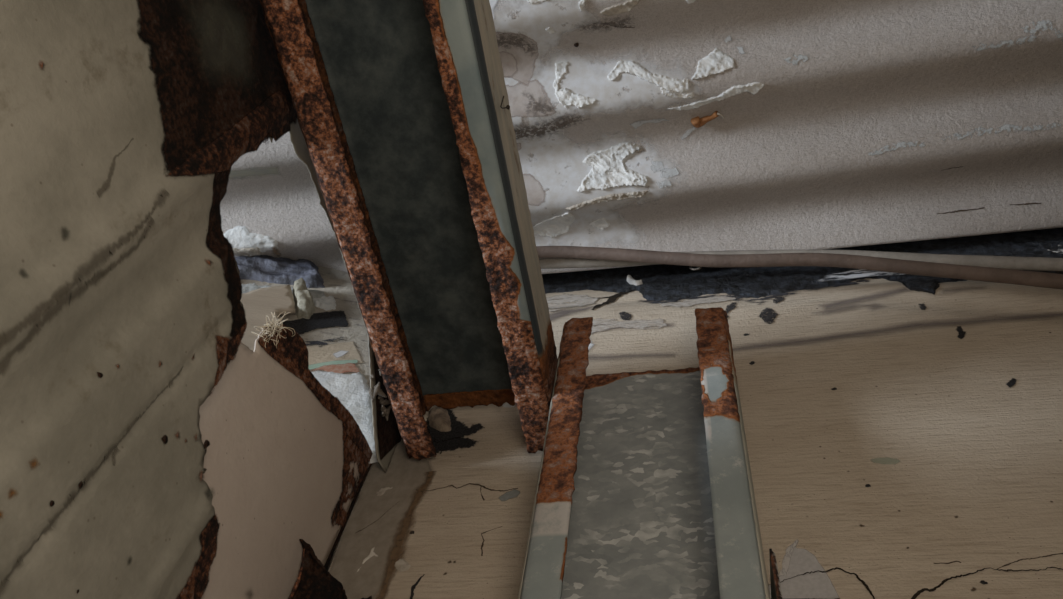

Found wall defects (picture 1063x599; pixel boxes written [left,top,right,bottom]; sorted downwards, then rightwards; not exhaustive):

peeling [553,61,596,108]
leakage [489,0,698,247]
peeling [607,48,764,110]
rust [138,0,297,394]
peeling [533,142,648,238]
rust [258,323,402,527]
crack [769,567,875,599]
crack [911,553,1063,599]